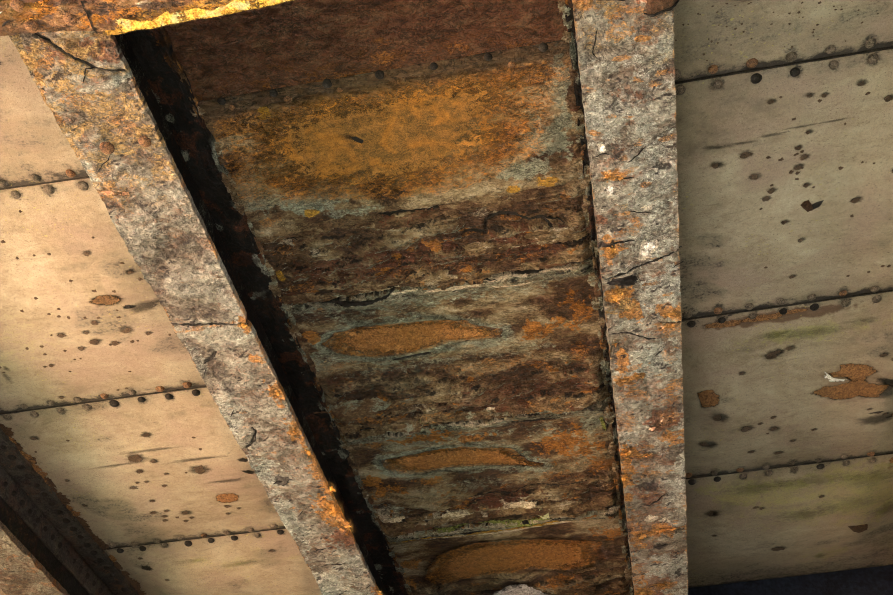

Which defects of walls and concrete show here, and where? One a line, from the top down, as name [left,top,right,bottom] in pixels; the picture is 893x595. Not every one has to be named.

corrosion [115,0,290,32]
corrosion [558,0,573,43]
spalling [644,0,680,17]
crack [35,33,125,82]
corrosion [176,59,207,122]
peeling [63,290,160,360]
corrosion [214,63,667,595]
corrosion [704,309,808,328]
spalling [764,345,795,359]
peeling [813,363,893,400]
peeling [860,408,893,424]
spalling [150,500,194,522]